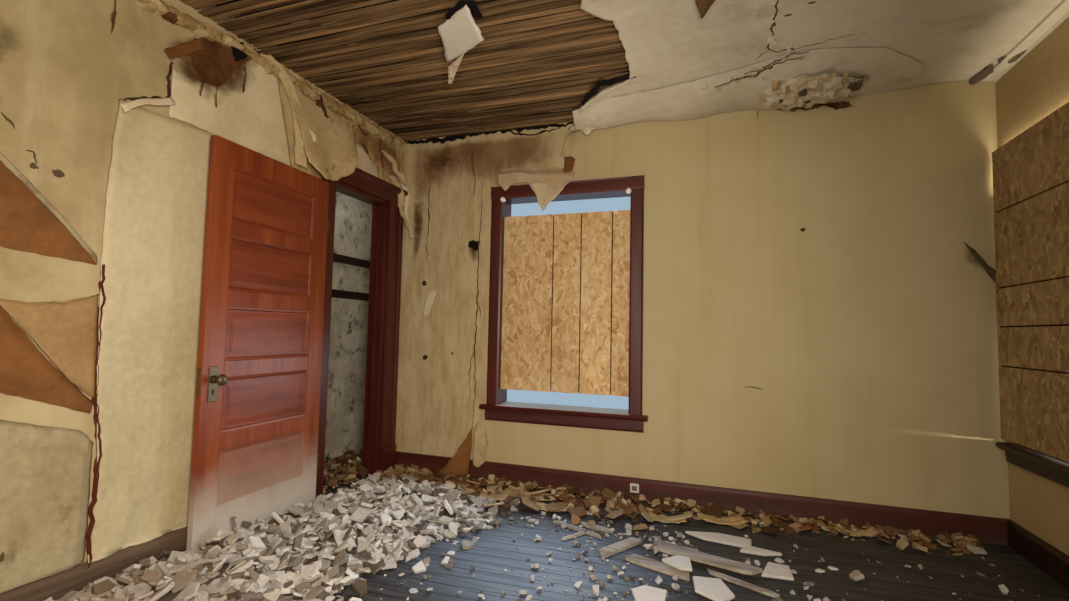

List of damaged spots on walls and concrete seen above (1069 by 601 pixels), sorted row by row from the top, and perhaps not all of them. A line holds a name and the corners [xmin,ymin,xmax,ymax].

flaking render [695,0,715,19]
crack [700,0,854,91]
flaking render [132,0,630,172]
flaking render [754,72,870,112]
peeling [969,50,1027,85]
peeling [356,142,380,178]
leakage [421,138,544,191]